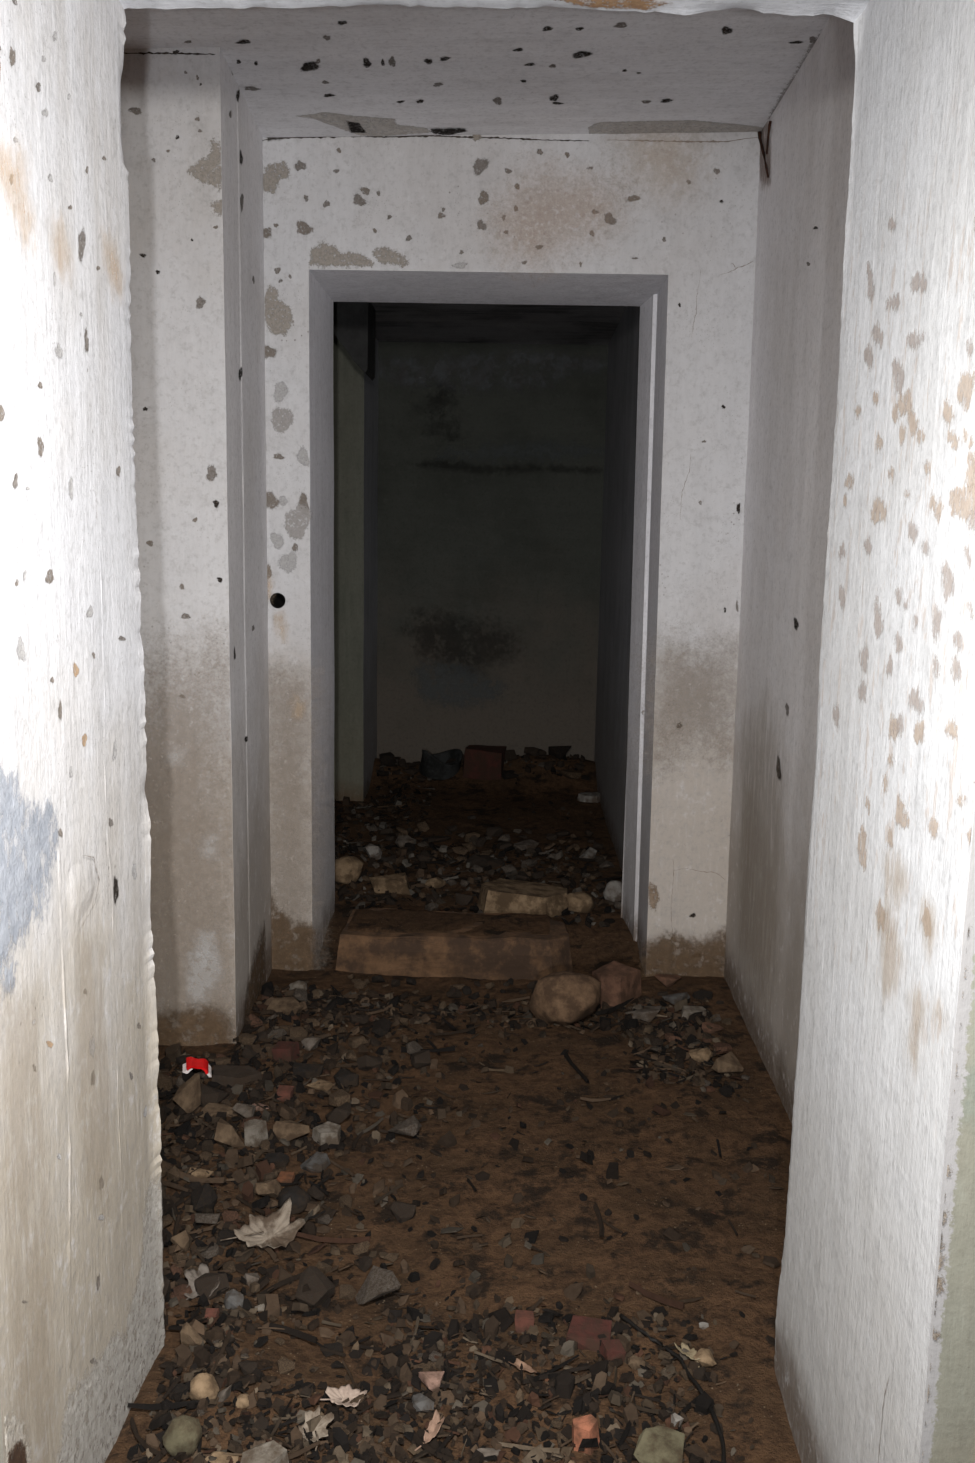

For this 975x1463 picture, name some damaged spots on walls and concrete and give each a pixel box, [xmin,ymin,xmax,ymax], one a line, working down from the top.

corrosion [555,0,666,10]